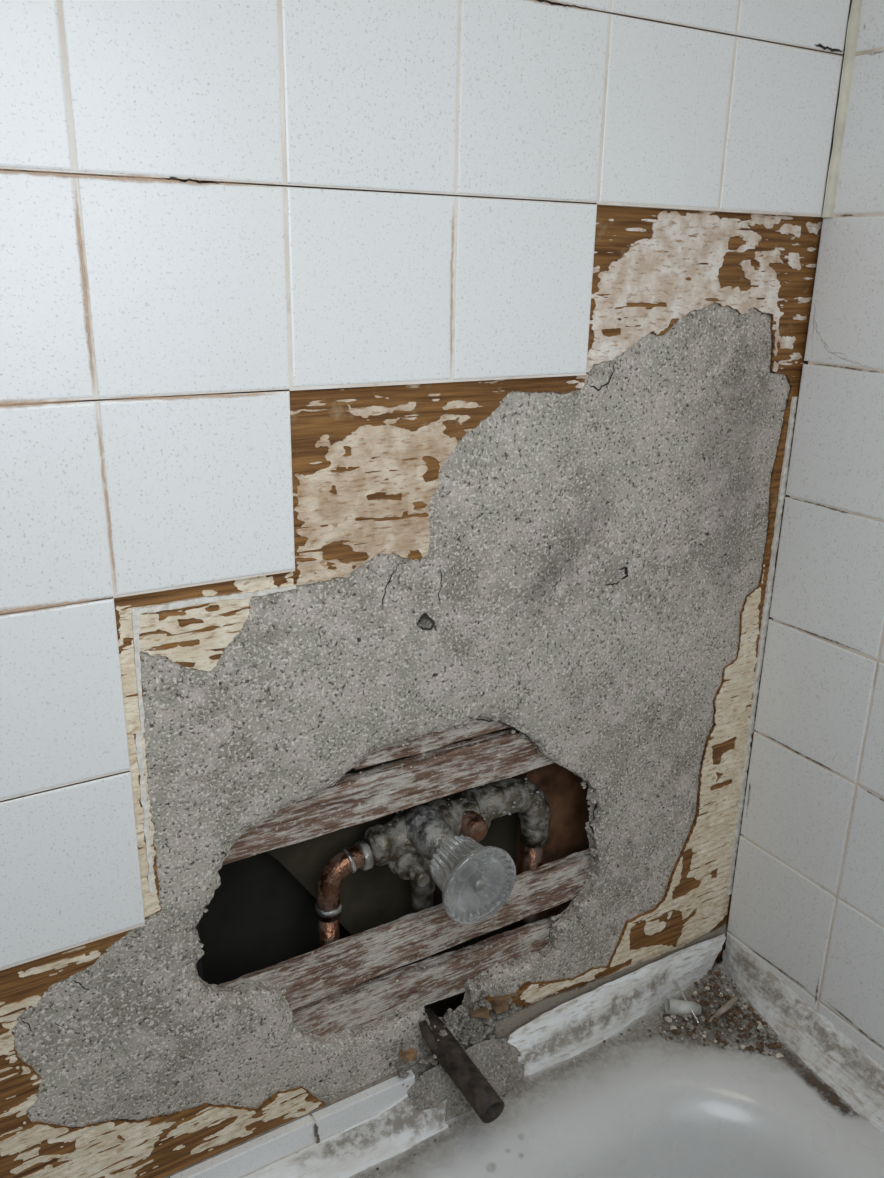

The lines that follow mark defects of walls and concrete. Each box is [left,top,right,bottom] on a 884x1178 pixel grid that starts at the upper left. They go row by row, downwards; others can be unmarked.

spalling [0,211,822,1178]